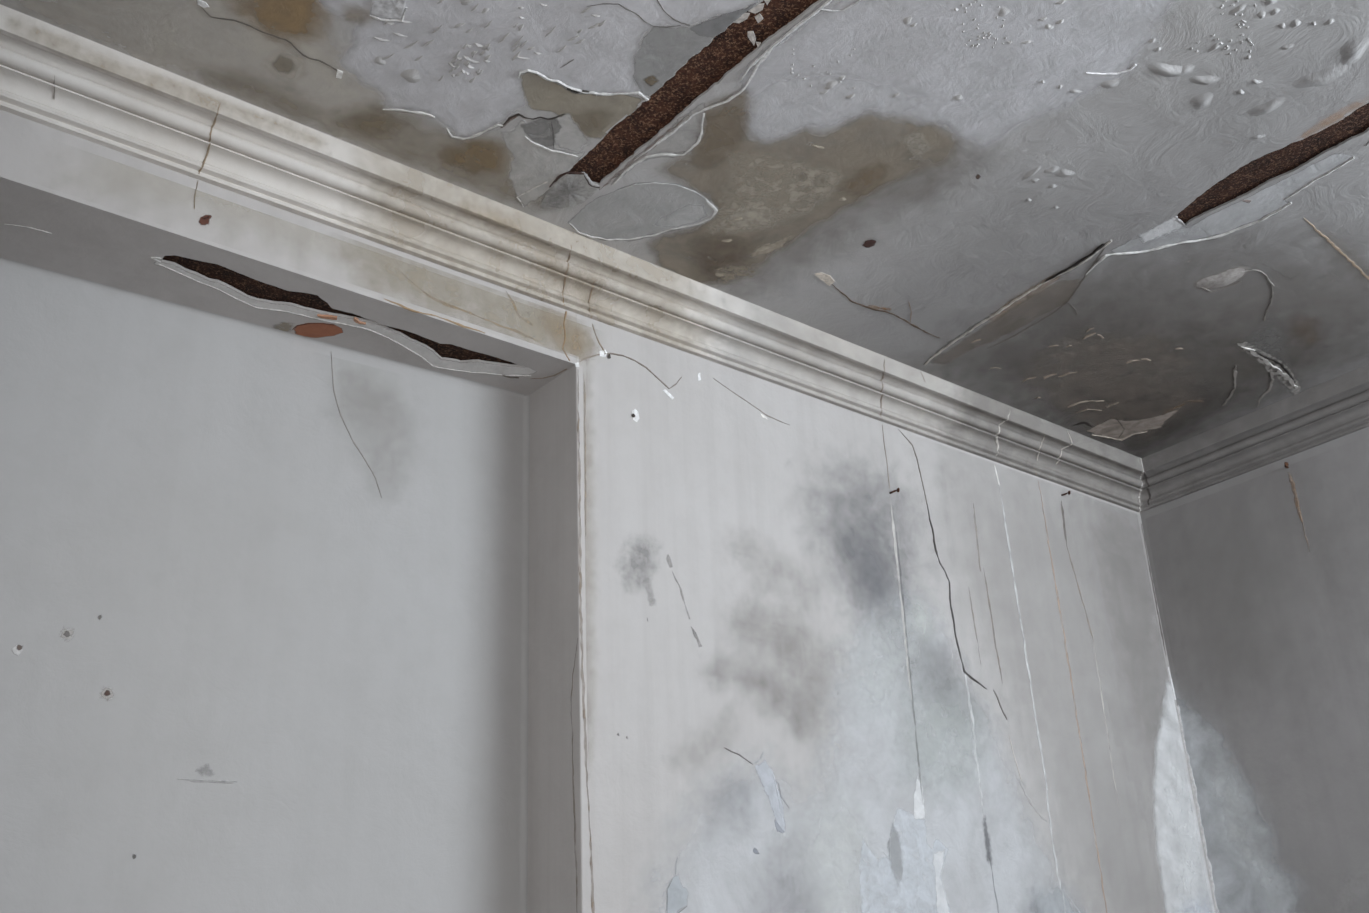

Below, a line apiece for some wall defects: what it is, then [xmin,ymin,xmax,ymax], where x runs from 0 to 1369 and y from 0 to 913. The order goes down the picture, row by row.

water stain [195,0,515,231]
flaking render [383,0,861,242]
water stain [637,94,955,283]
flaking render [1086,143,1369,275]
corrosion [163,255,515,364]
flaking render [151,257,537,378]
crack [815,240,1112,382]
crack [1036,431,1072,464]
crack [880,360,1022,781]
water stain [677,589,1080,913]
water stain [1155,667,1295,913]